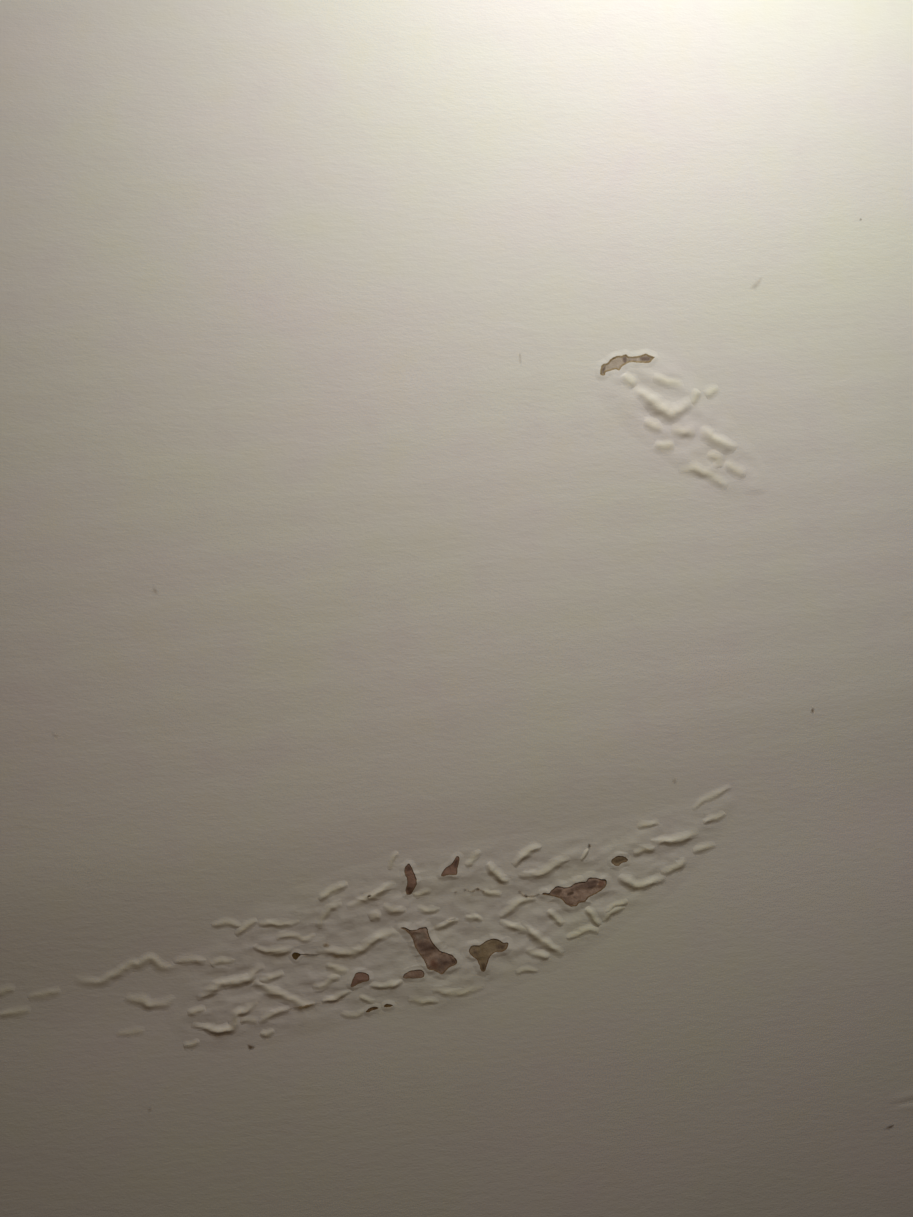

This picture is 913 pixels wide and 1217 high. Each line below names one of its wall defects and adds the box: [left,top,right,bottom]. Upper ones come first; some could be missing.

peeling [594,348,659,381]
peeling [399,851,464,900]
peeling [535,851,633,913]
peeling [393,920,514,980]